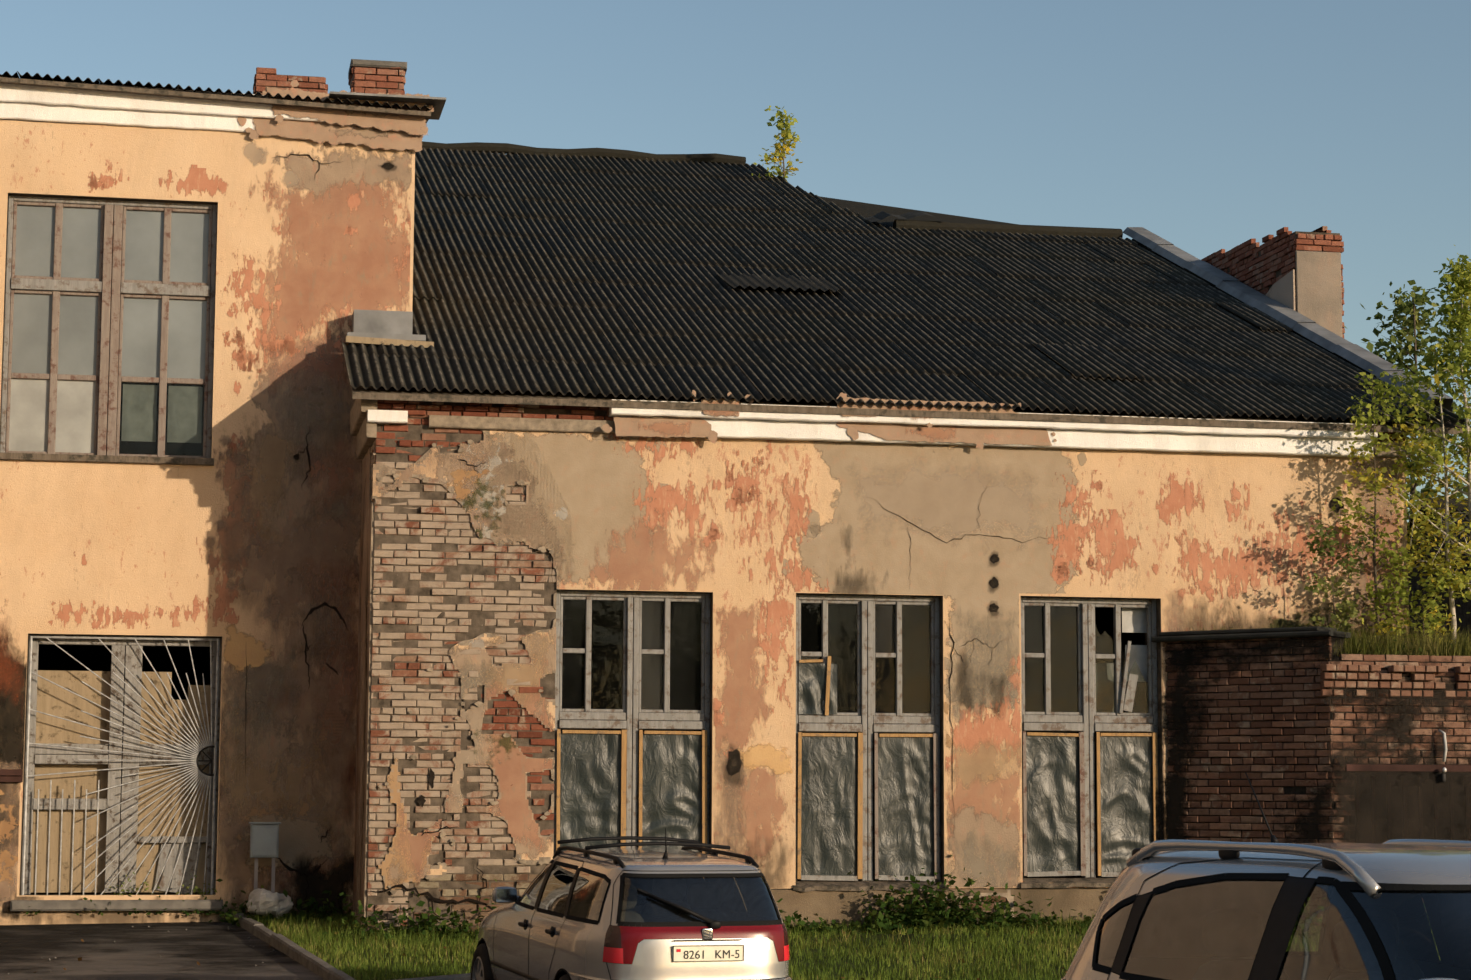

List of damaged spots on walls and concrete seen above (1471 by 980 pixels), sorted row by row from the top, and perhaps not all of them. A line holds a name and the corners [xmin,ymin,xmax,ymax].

water stain [0,635,27,769]
crack [302,479,368,757]
flaking render [48,80,1159,934]
crack [874,482,1053,583]
peeling [1156,457,1403,632]
water stain [1152,602,1471,844]
peeling [0,767,34,918]
water stain [72,911,159,923]